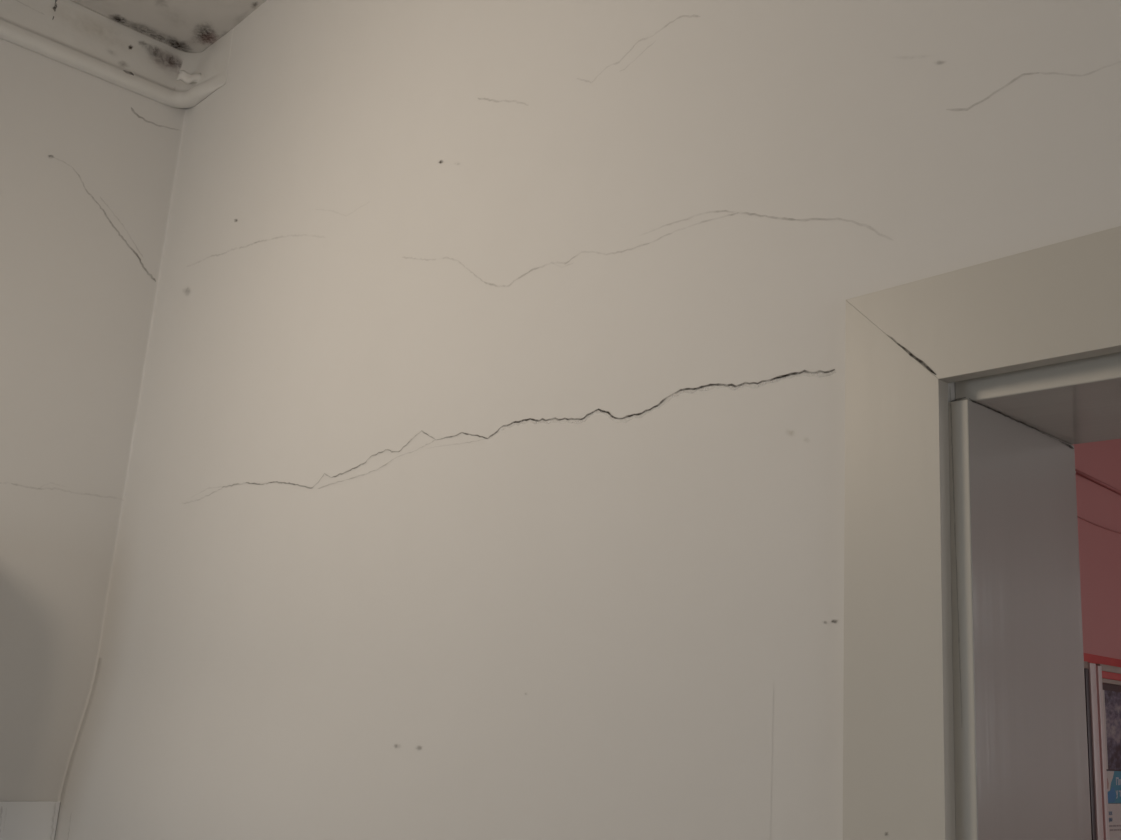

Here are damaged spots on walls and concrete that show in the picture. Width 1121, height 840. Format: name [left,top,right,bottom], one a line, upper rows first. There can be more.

crack [450,369,835,439]